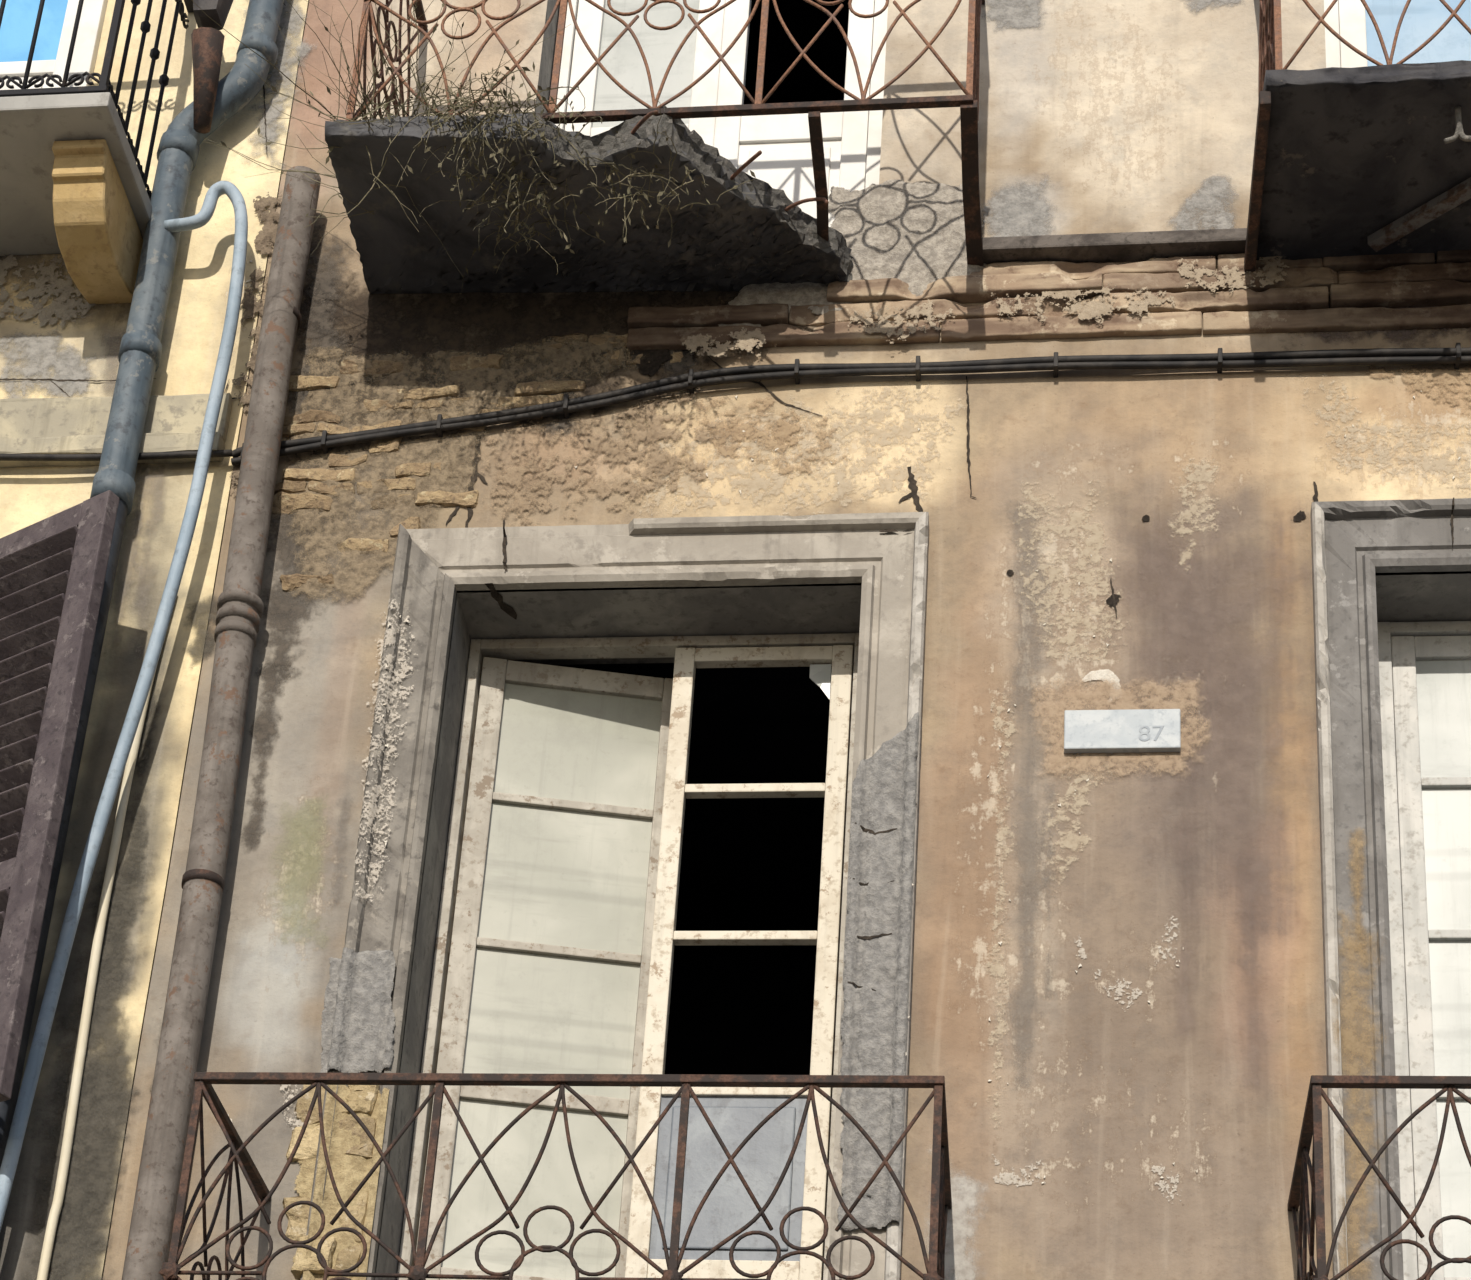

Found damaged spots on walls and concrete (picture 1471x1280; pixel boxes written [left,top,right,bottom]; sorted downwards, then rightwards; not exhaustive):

spalling [0,254,96,399]
leakage [287,225,740,435]
spalling [828,179,987,296]
flaking render [271,332,963,602]
crack [879,466,923,532]
crack [966,376,976,498]
leakage [244,511,334,848]
peeling [354,599,418,902]
leakage [1032,680,1210,775]
spalling [837,713,922,1232]
flaking render [280,1085,389,1280]
leakage [944,1177,977,1280]